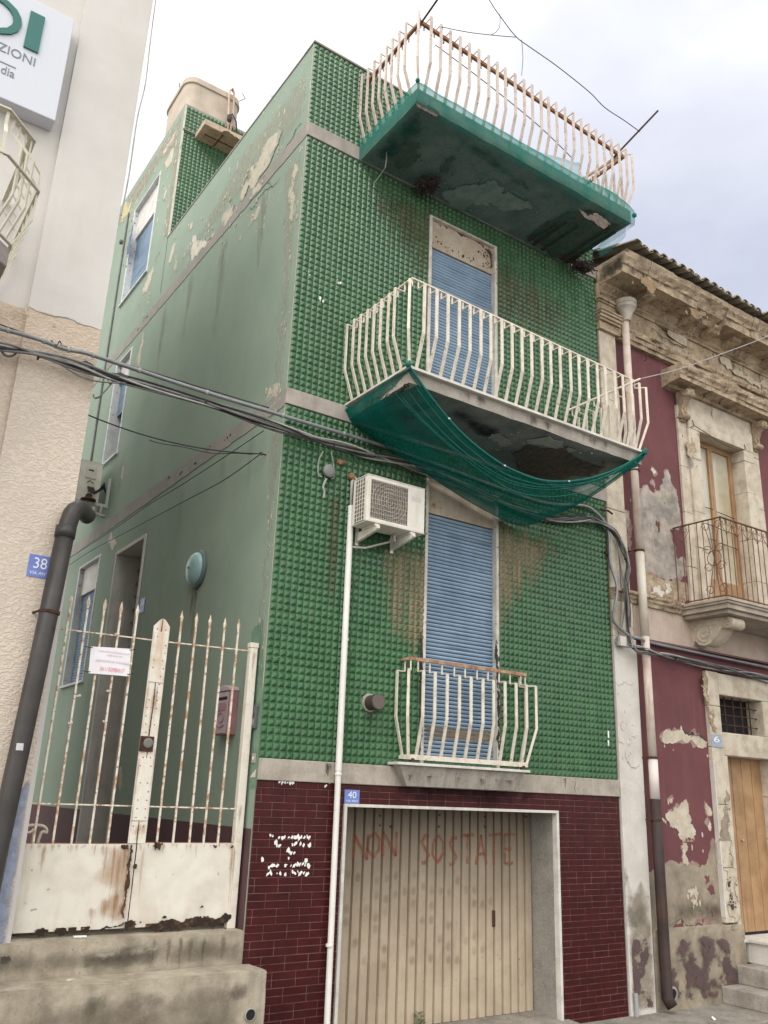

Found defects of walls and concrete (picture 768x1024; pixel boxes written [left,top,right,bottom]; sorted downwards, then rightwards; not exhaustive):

peeling [118,94,303,271]
spalling [433,148,620,264]
flaking render [625,466,689,602]
flaking render [659,671,717,758]
flaking render [649,790,744,948]